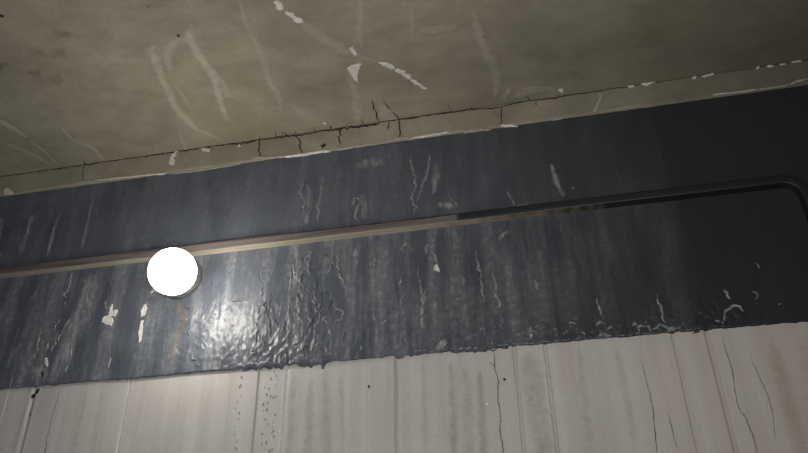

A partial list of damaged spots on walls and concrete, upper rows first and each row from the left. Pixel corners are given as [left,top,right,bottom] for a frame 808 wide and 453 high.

peeling [4,151,240,195]
water stain [143,22,232,150]
crack [1,79,680,177]
peeling [253,1,518,159]
peeling [713,78,808,95]
peeling [30,272,118,399]
peeling [138,304,147,343]
crack [490,351,504,453]